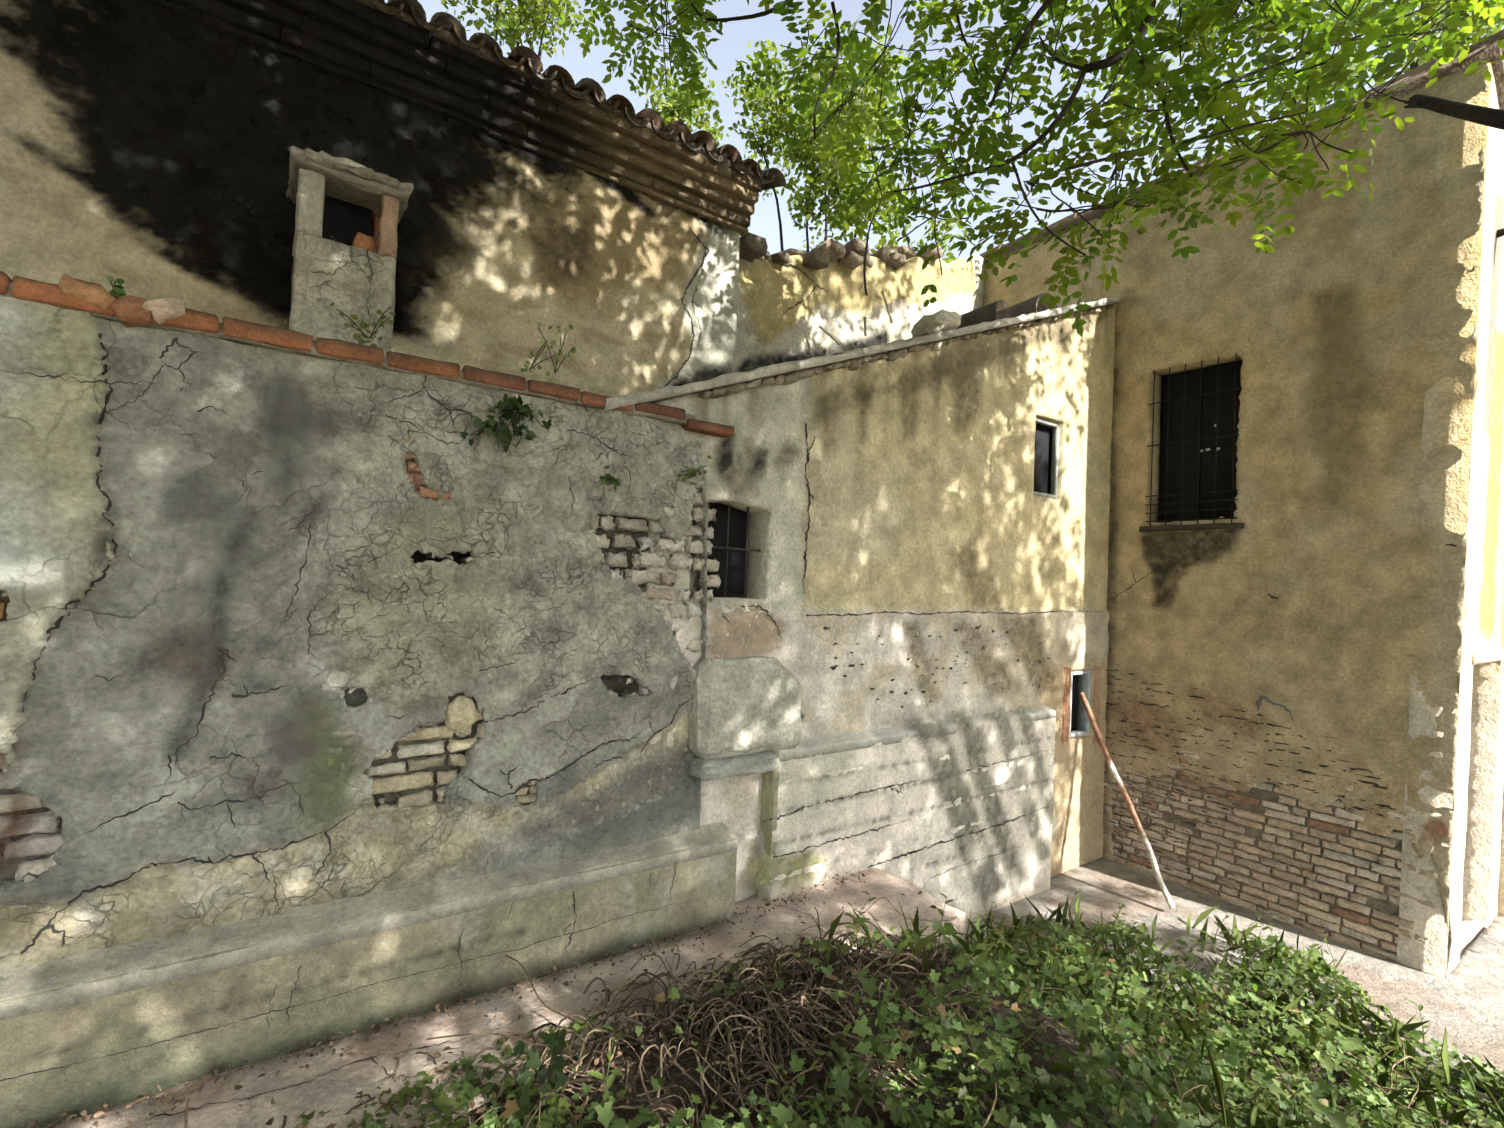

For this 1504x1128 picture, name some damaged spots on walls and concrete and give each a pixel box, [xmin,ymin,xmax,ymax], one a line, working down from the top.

crack [21,338,263,488]
spalling [403,437,451,506]
crack [385,375,475,445]
leakage [1480,199,1504,644]
spalling [0,333,118,883]
crack [274,503,402,658]
spalling [410,551,473,564]
spalling [590,489,780,698]
crack [20,624,393,955]
spalling [364,692,485,808]
crack [469,697,693,797]
peeling [1103,664,1452,976]